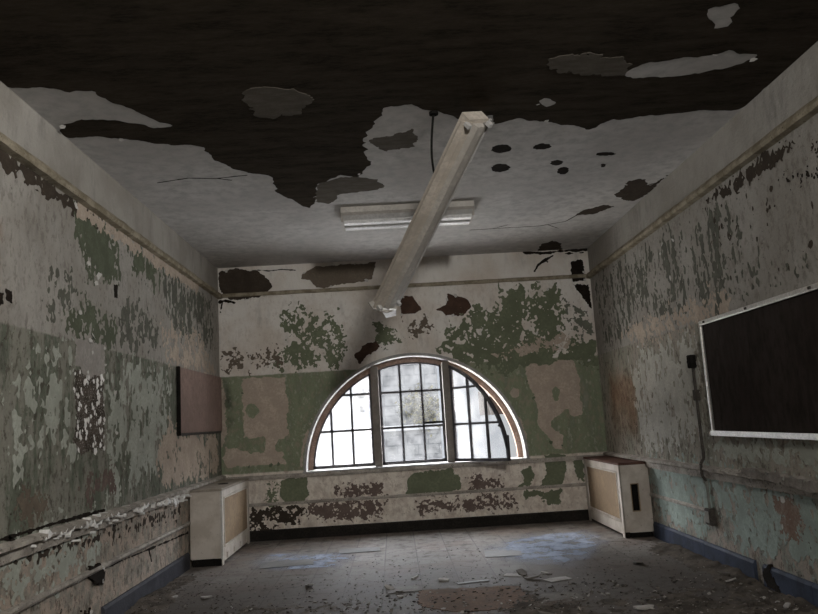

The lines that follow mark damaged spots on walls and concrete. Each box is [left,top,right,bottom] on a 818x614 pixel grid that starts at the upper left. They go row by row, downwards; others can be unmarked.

spalling [0,0,818,208]
peeling [0,139,818,614]